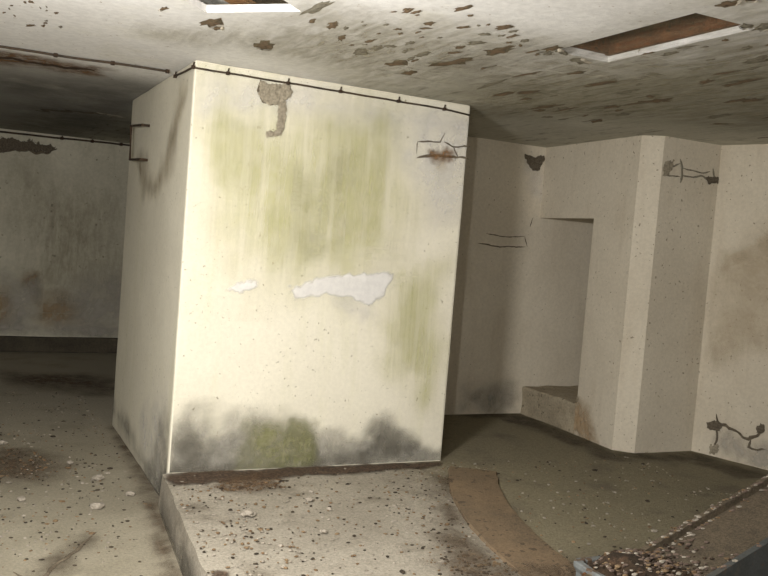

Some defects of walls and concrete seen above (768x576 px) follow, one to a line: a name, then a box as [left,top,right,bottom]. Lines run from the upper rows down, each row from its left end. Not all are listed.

peeling [300,1,334,23]
peeling [326,5,592,75]
peeling [642,45,709,56]
peeling [698,44,768,87]
peeling [714,0,758,8]
peeling [738,23,768,32]
peeling [476,71,674,123]
spalling [0,137,57,155]
peeling [293,273,392,305]
water stain [149,421,442,492]
crack [43,532,96,576]